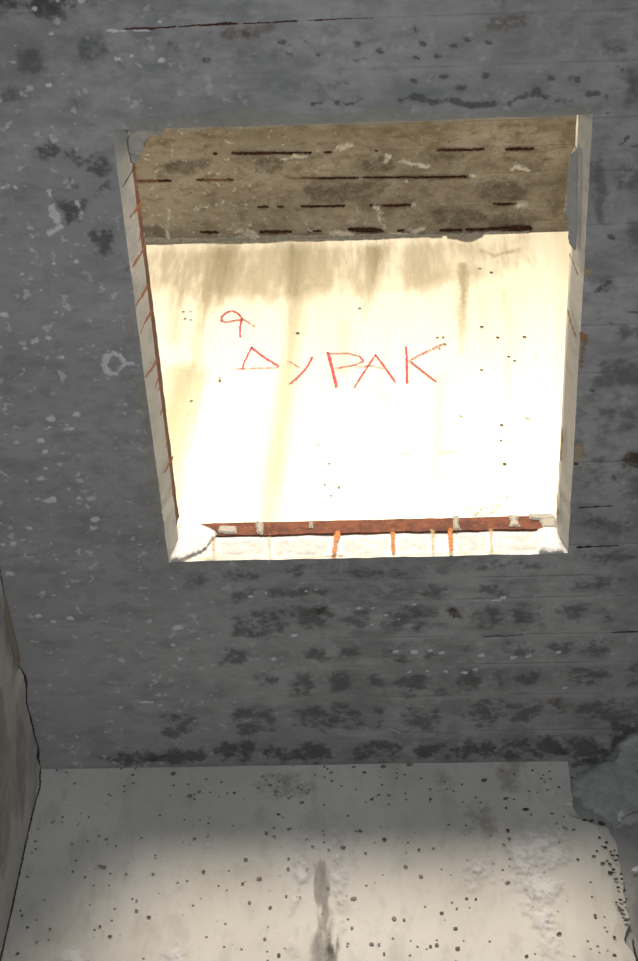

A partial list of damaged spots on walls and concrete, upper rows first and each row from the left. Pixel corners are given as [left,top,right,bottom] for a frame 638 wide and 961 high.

crack [123,17,372,30]
spalling [145,230,529,245]
rust [567,309,588,362]
rust [623,452,638,467]
rust [325,530,348,558]
rust [365,528,508,556]
spalling [562,819,630,922]
water stain [295,829,344,961]